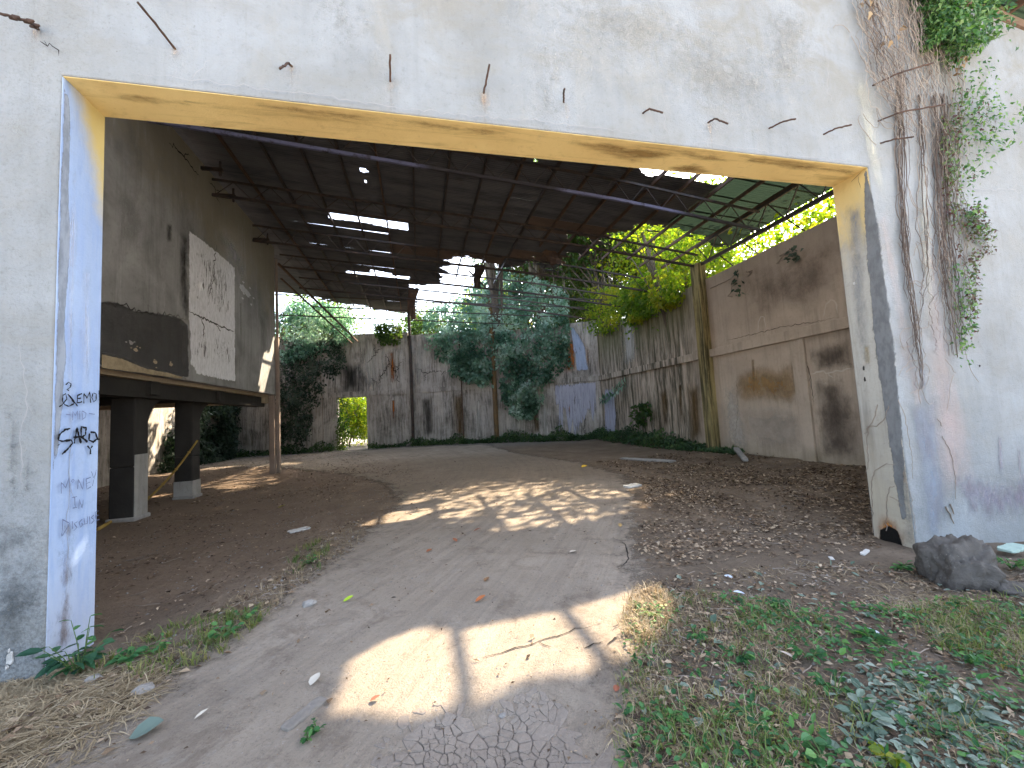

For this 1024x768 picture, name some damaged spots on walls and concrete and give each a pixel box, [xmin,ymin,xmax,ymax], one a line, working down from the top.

damp [591,145,667,157]
crack [104,245,235,338]
peeling [102,232,255,381]
damp [819,349,844,365]
damp [822,387,852,452]